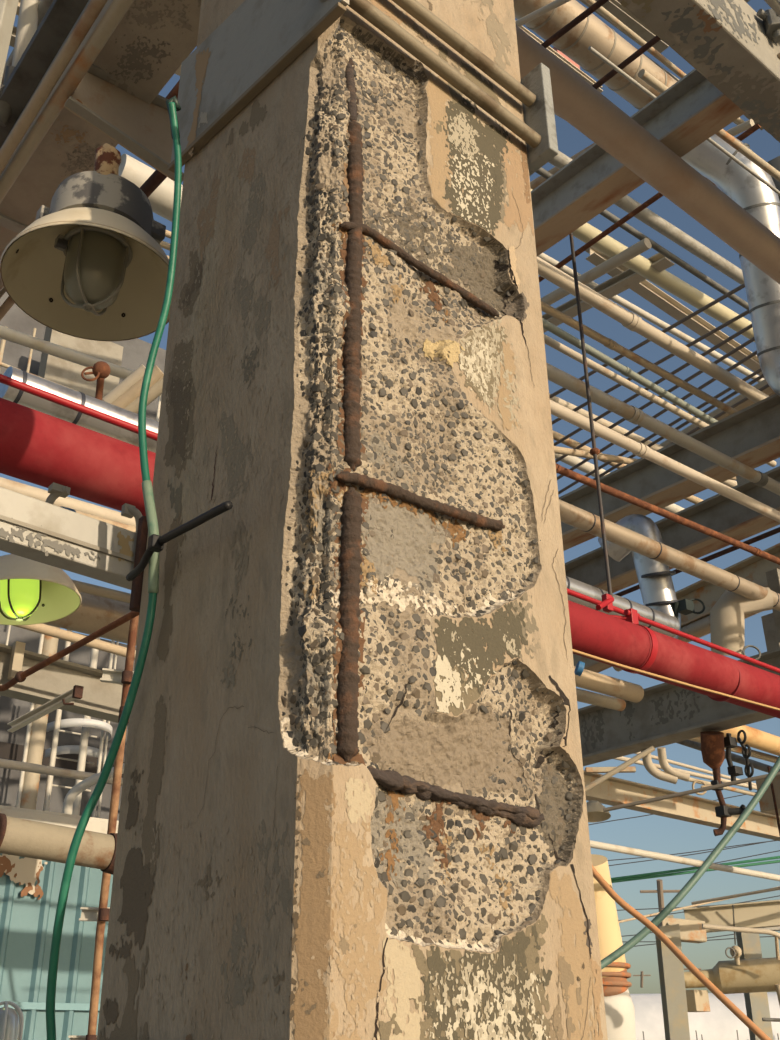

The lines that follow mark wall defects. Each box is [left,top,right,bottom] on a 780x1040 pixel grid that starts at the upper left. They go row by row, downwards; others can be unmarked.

corrosion [305,125,471,766]
spalling [278,15,583,1040]
crack [374,938,388,1040]
corrosion [379,775,542,915]
crack [509,550,591,1040]